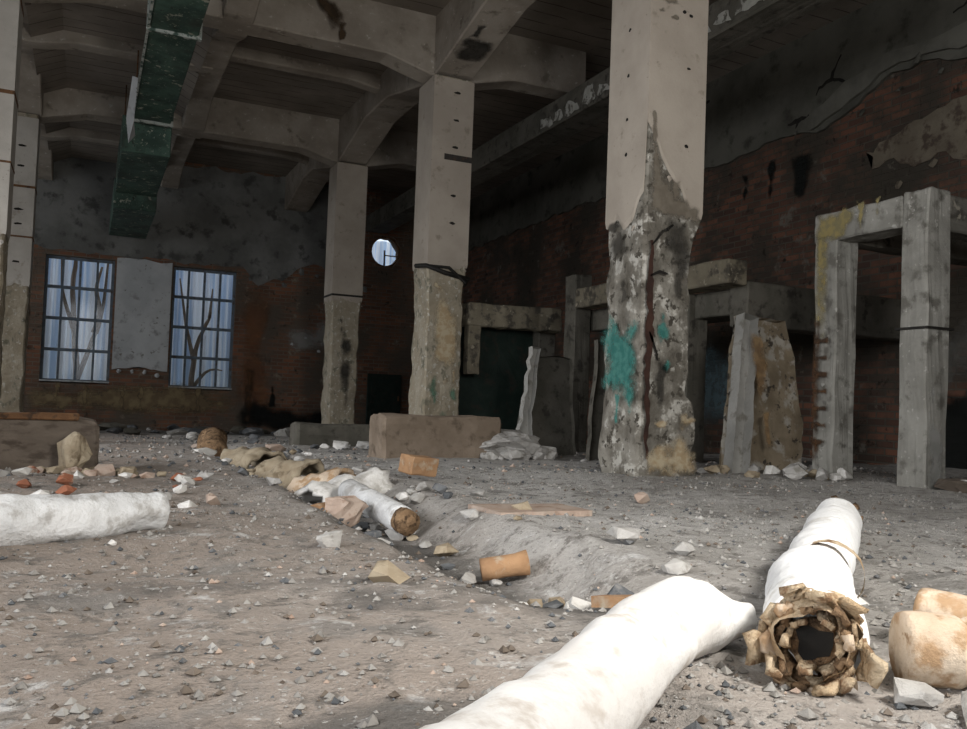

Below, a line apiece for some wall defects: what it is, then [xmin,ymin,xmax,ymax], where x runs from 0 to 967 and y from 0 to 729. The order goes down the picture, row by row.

water stain [317,0,346,40]
water stain [457,26,491,61]
peeling [412,0,967,276]
spalling [436,300,456,382]
spalling [648,439,694,475]